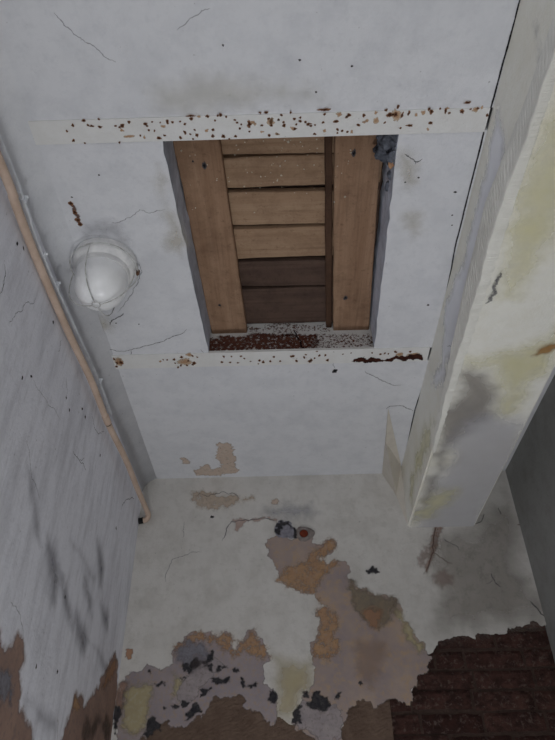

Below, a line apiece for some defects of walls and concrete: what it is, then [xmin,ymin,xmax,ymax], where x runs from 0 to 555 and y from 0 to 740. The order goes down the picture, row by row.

rust [114,105,451,144]
rust [159,353,198,368]
rust [209,323,423,364]
damp [489,340,555,412]
peeling [180,442,239,476]
damp [416,374,517,527]
peeling [192,491,253,518]
peeling [62,520,555,740]
peeling [0,633,32,740]